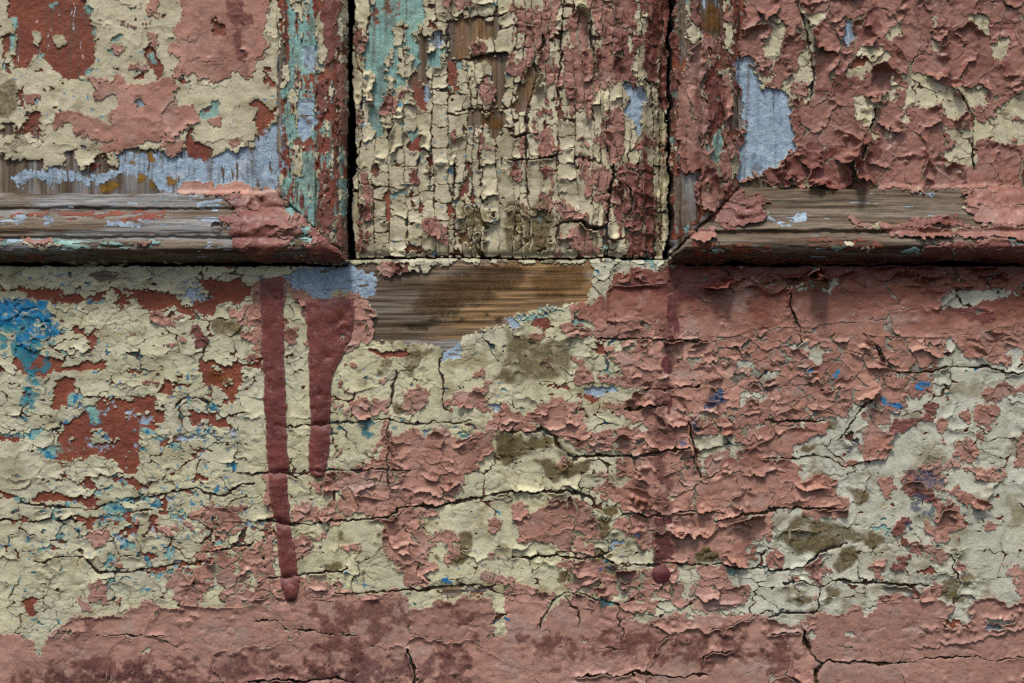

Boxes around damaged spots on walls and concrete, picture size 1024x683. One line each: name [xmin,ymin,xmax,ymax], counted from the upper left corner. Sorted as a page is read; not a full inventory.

peeling [0,0,305,195]
peeling [173,0,349,266]
peeling [383,20,408,72]
peeling [669,0,1024,265]
peeling [18,236,63,251]
peeling [89,428,120,448]